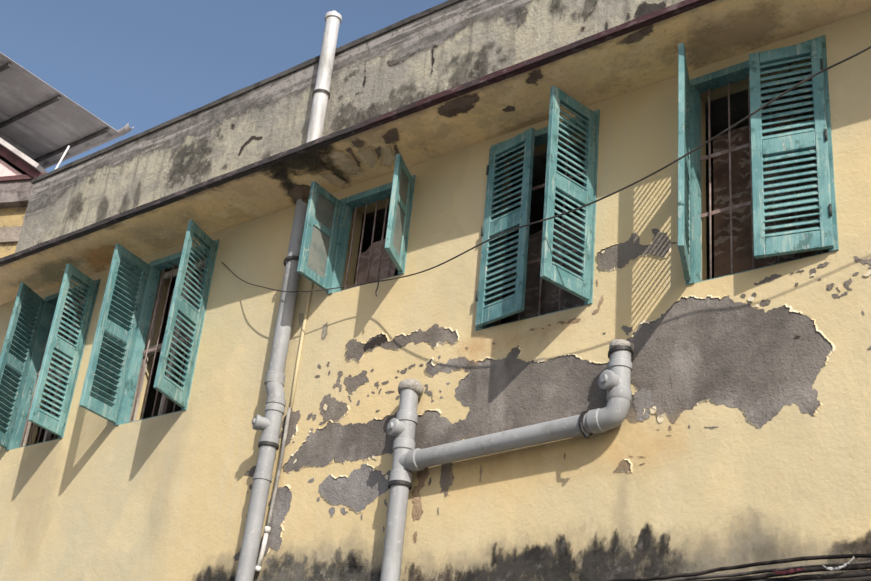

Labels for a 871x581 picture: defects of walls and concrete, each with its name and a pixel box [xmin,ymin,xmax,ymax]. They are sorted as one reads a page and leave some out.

leakage [627,1,666,19]
leakage [332,43,506,133]
spalling [437,94,479,118]
leakage [167,129,222,187]
crack [232,124,263,155]
leakage [257,144,348,203]
spalling [595,227,678,285]
spalling [621,256,871,437]
spalling [257,324,608,566]
leakage [255,550,381,581]
leakage [409,523,703,581]
leakage [822,532,871,574]